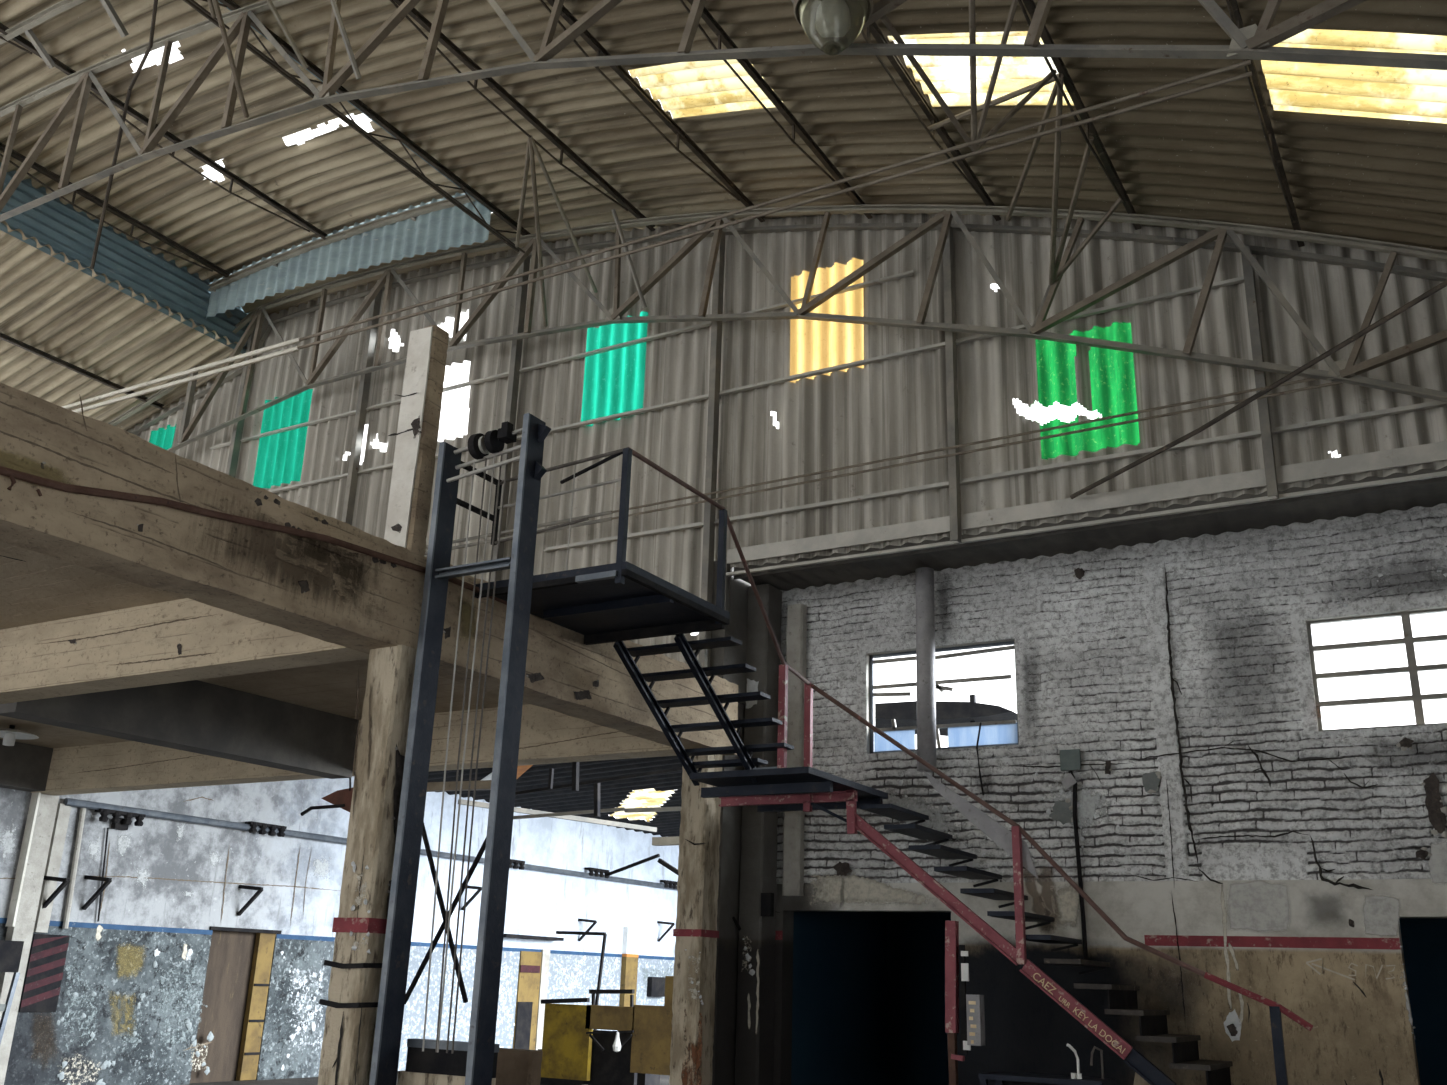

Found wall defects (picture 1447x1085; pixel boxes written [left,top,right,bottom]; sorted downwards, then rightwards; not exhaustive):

damp [227,518,370,600]
crack [1016,562,1378,1028]
spalling [1416,772,1447,860]